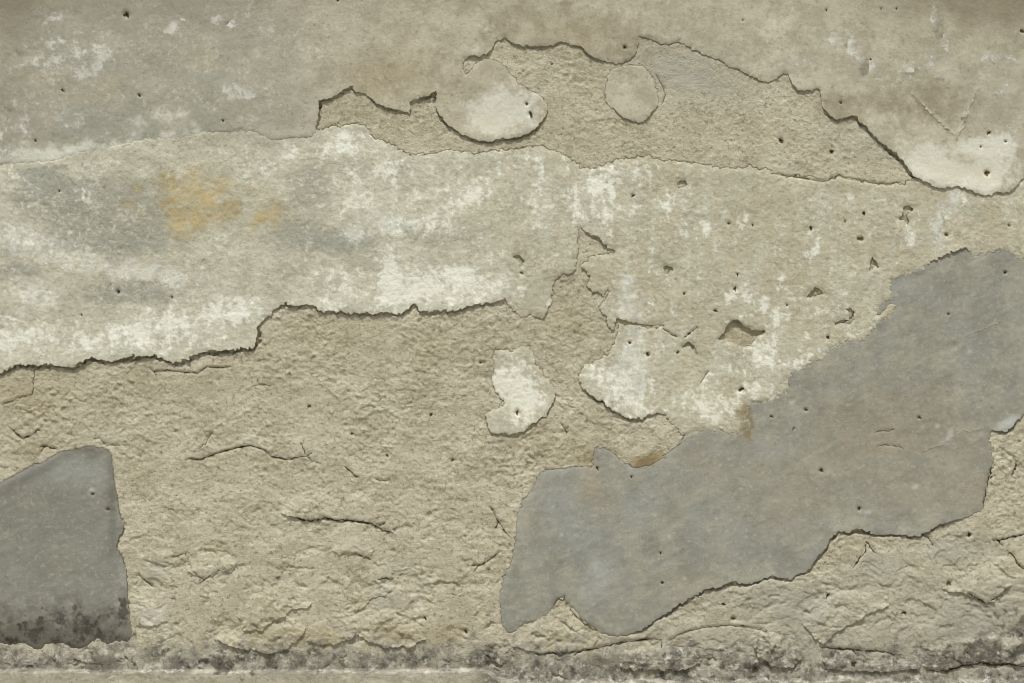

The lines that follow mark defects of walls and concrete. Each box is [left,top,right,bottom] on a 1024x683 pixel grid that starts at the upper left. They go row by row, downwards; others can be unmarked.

spalling [308,36,1024,196]
crack [190,433,315,462]
spalling [0,218,1024,652]
crack [289,516,392,533]
leakage [5,598,130,653]
leakage [186,655,234,674]